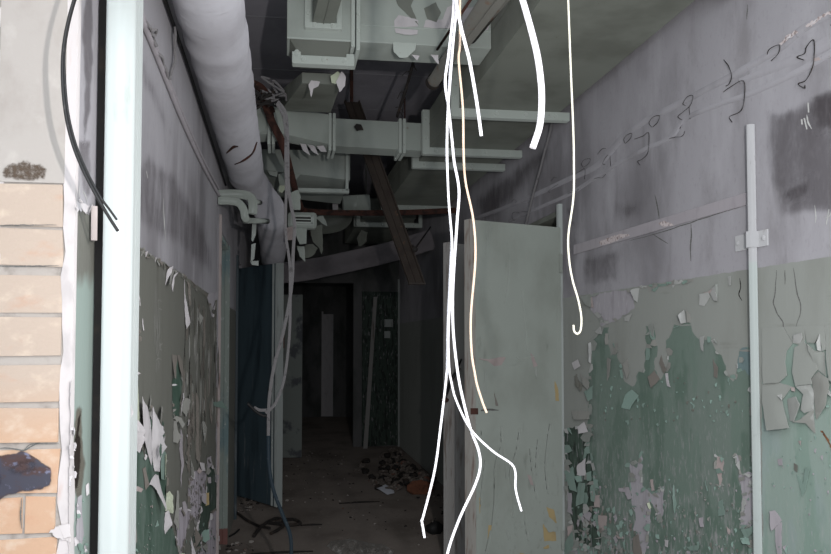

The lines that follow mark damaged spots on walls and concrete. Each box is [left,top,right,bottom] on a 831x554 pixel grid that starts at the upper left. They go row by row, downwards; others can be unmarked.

mould [3,161,46,180]
crack [773,268,801,327]
peeling [49,381,89,554]
peeling [129,247,228,554]
peeling [543,279,831,554]